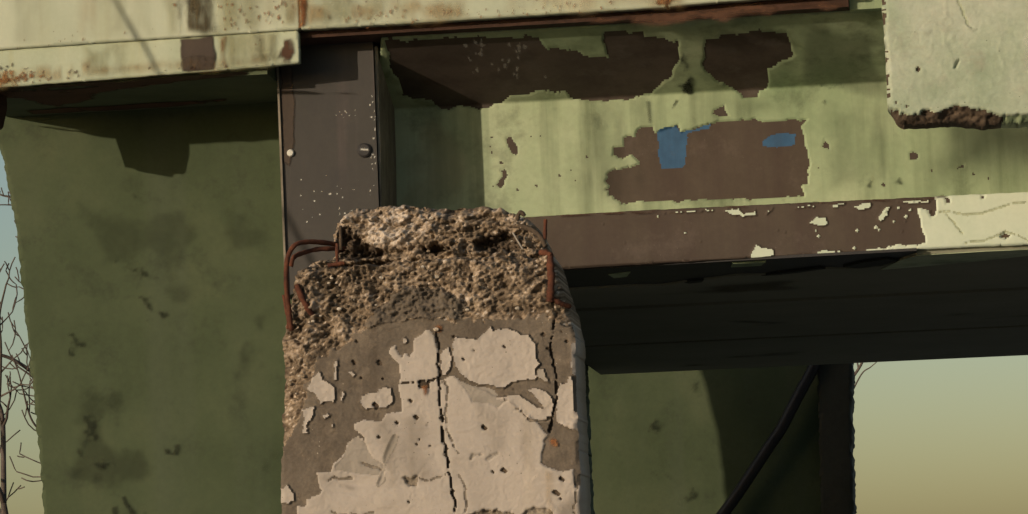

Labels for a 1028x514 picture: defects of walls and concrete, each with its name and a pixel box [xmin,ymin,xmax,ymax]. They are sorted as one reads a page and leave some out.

corrosion [0,64,269,114]
leakage [180,0,216,71]
corrosion [218,0,329,49]
corrosion [278,39,294,62]
peeling [385,30,680,110]
corrosion [594,0,843,25]
peeling [702,28,793,98]
spalling [885,49,1028,130]
spalling [281,106,950,514]
crack [515,323,559,433]
crack [401,331,468,512]